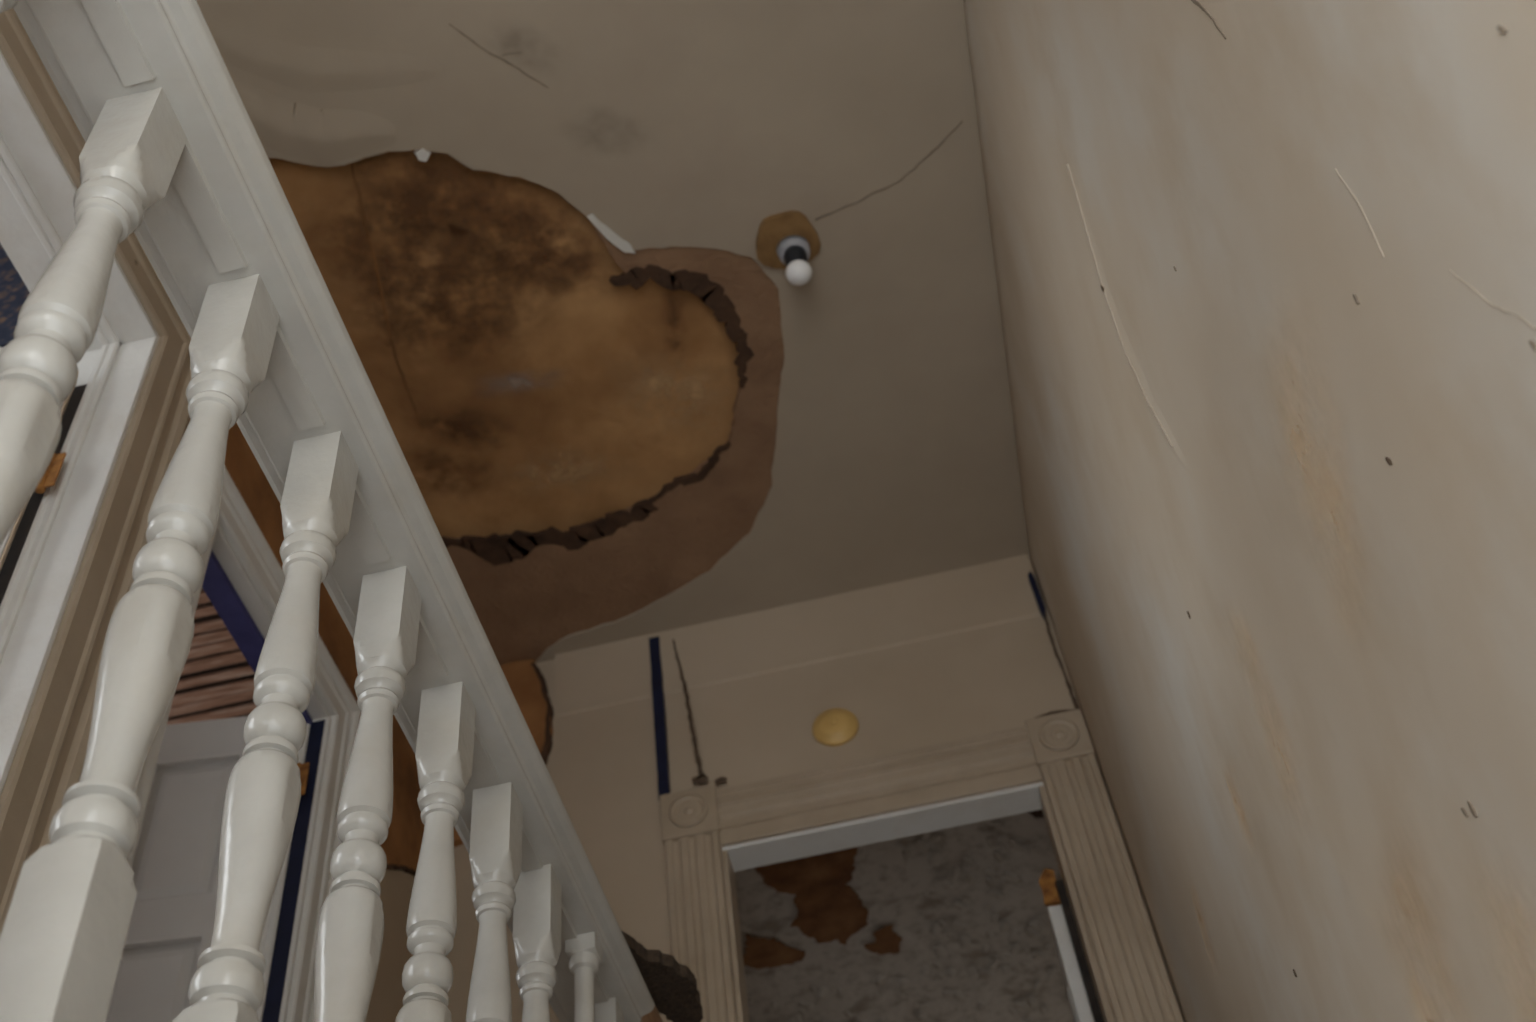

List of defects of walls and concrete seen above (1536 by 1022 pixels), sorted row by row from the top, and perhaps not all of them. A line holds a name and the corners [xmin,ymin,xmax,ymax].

crack [1191,0,1226,39]
flaking render [224,423,284,570]
flaking render [269,149,784,765]
crack [673,639,727,785]
flaking render [380,715,425,876]
flaking render [454,827,463,847]
peeling [743,846,902,969]